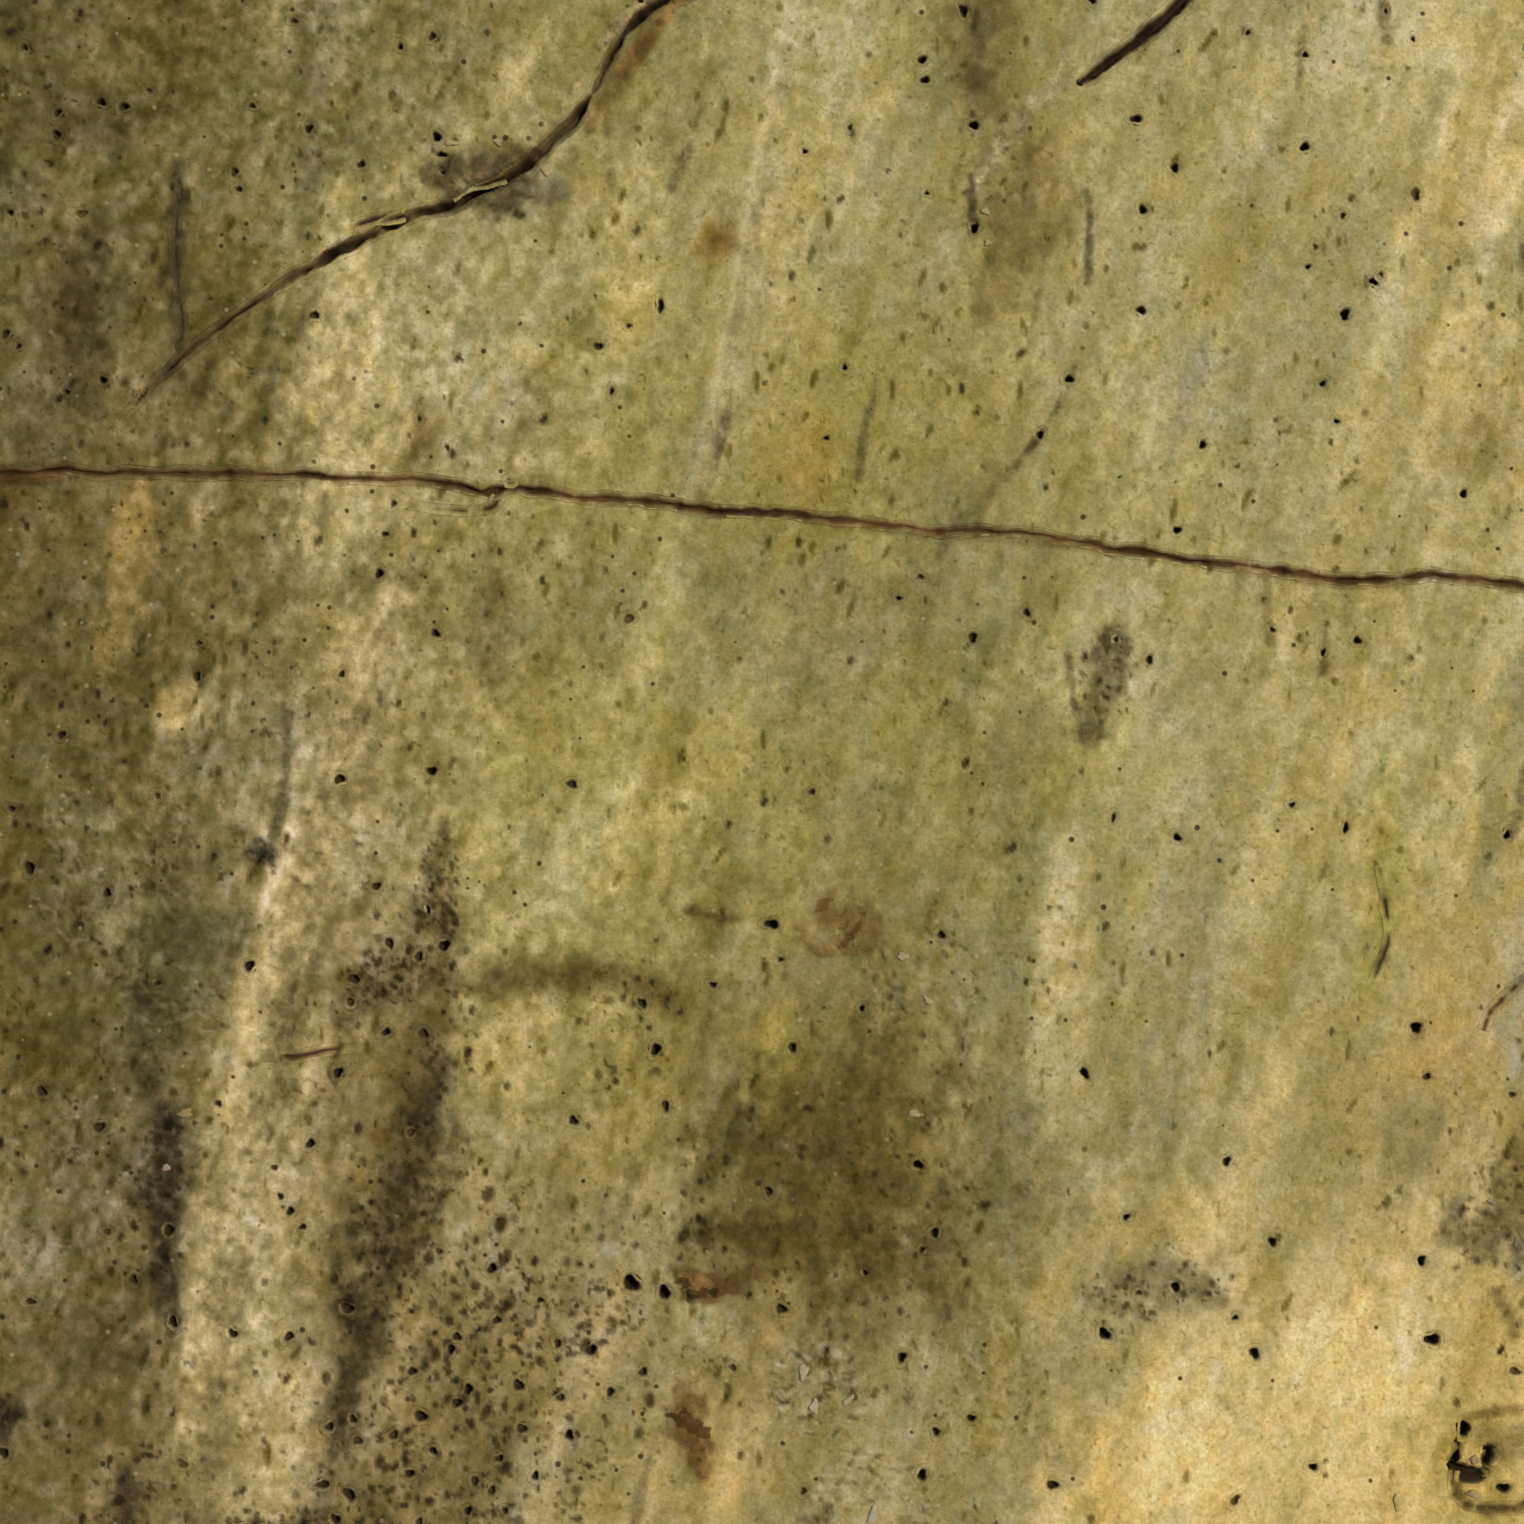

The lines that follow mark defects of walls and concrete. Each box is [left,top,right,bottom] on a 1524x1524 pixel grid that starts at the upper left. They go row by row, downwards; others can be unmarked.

crack [0,0,1524,593]
damp [1074,627,1130,742]
corrosion [798,889,883,956]
damp [401,1060,457,1150]
damp [686,1051,960,1326]
damp [330,1165,444,1461]
corrosion [664,1388,716,1479]